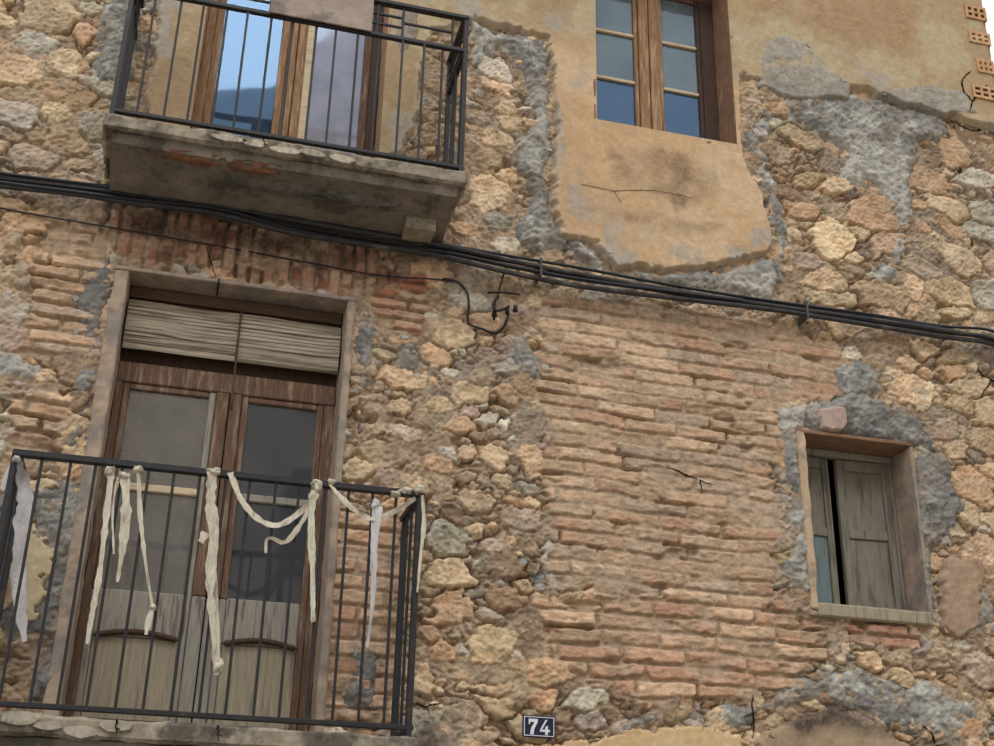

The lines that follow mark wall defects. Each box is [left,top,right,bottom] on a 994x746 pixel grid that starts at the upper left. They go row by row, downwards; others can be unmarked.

spalling [756,35,851,102]
spalling [880,85,977,121]
crack [961,71,987,112]
crack [978,369,994,396]
peeling [816,400,847,434]
crack [667,466,712,491]
peeling [0,512,57,621]